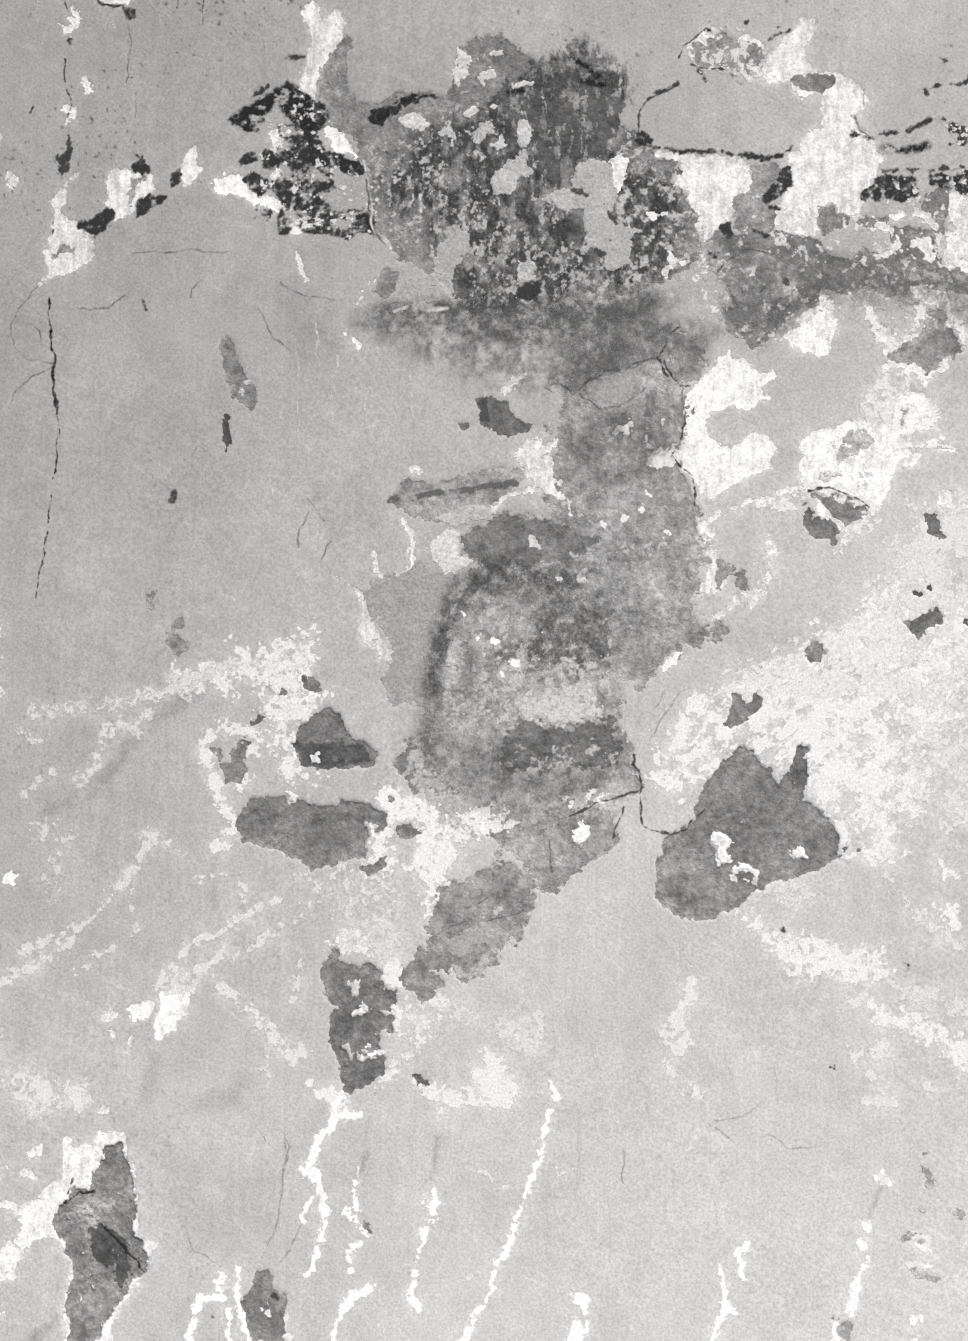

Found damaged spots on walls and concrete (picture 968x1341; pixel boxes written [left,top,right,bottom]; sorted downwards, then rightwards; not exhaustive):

peeling [104,168,156,222]
peeling [210,156,359,241]
spalling [291,1,968,555]
crack [31,297,60,595]
damp [416,479,519,499]
spalling [0,322,968,1115]
spalling [0,1033,159,1341]
damp [183,1265,252,1341]
spalling [240,1269,288,1341]
damp [298,1093,378,1341]
damp [405,1187,441,1314]
damp [456,1080,581,1341]